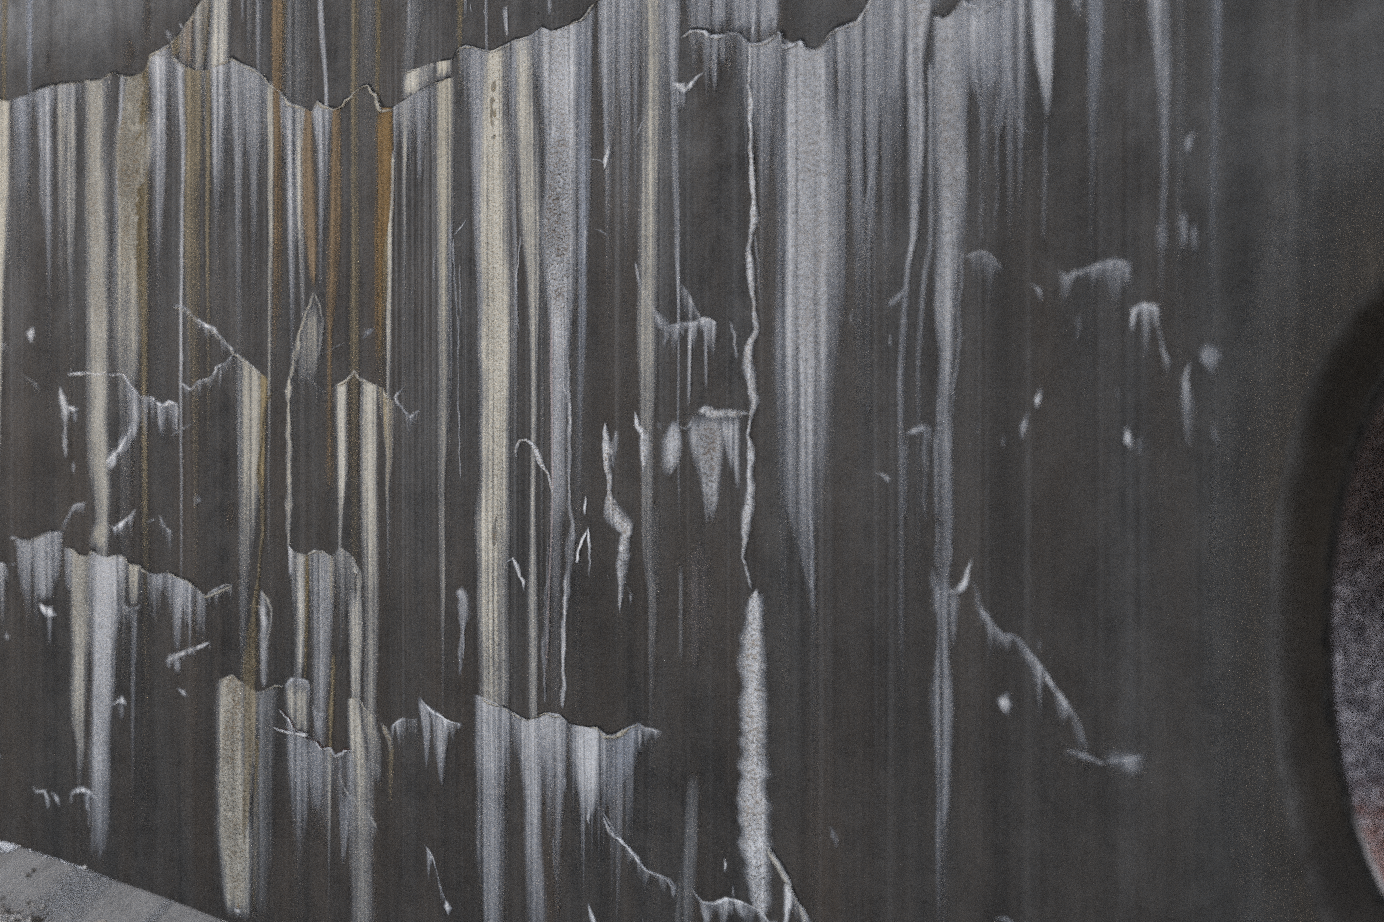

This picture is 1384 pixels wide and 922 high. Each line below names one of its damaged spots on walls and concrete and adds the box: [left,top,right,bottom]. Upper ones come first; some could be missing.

damp [0,79,191,828]
crack [69,319,232,468]
corrosion [243,0,282,690]
crack [0,0,599,112]
damp [219,294,405,922]
corrosion [302,0,358,435]
corrosion [375,108,394,400]
damp [394,0,736,869]
crack [604,816,809,922]
damp [741,589,767,917]
crack [680,0,871,585]
damp [694,0,1053,536]